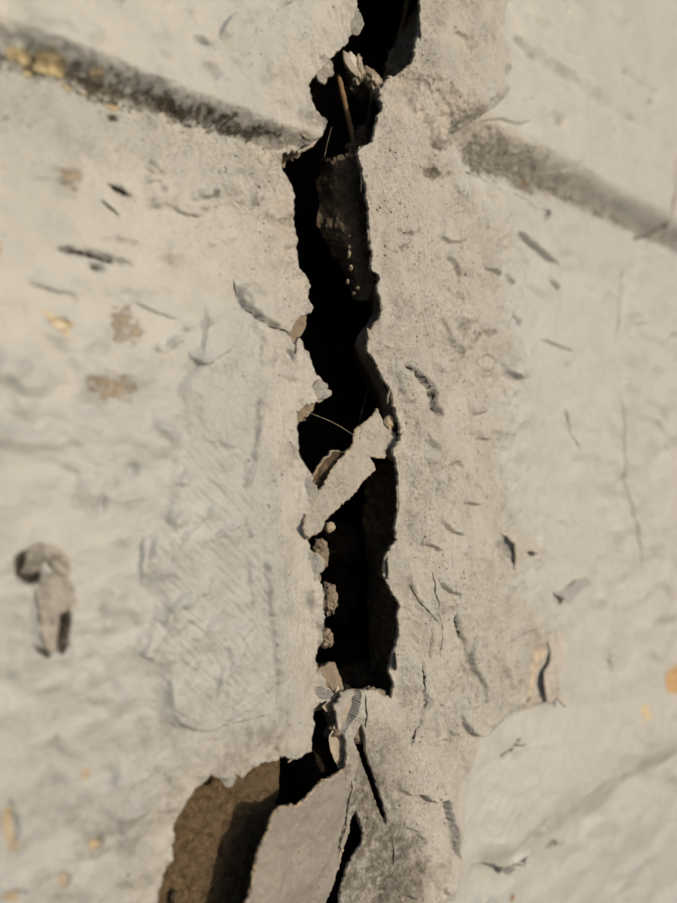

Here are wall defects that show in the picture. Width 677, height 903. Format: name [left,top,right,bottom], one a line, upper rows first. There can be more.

crack [632,164,677,243]
crack [200,0,466,903]
crack [619,394,643,572]
spalling [158,758,350,903]